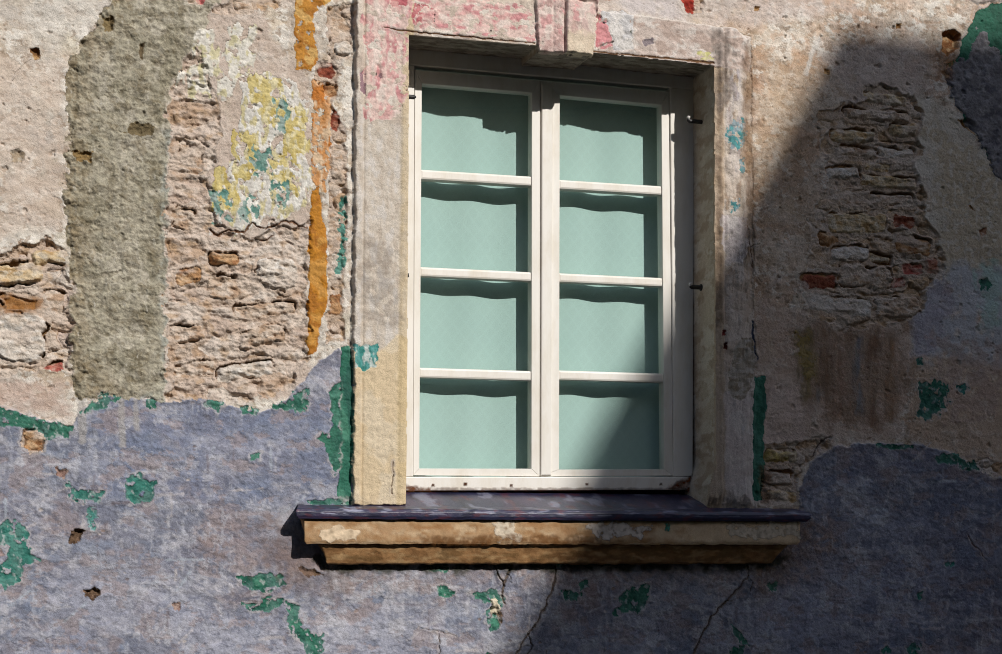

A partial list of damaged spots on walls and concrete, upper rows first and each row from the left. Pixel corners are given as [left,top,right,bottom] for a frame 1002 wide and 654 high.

flaking render [124,122,155,138]
flaking render [0,235,78,379]
flaking render [146,0,613,505]
flaking render [796,83,947,336]
peeling [125,472,158,505]
flaking render [722,330,833,506]
crack [515,564,557,654]
crack [692,564,754,654]